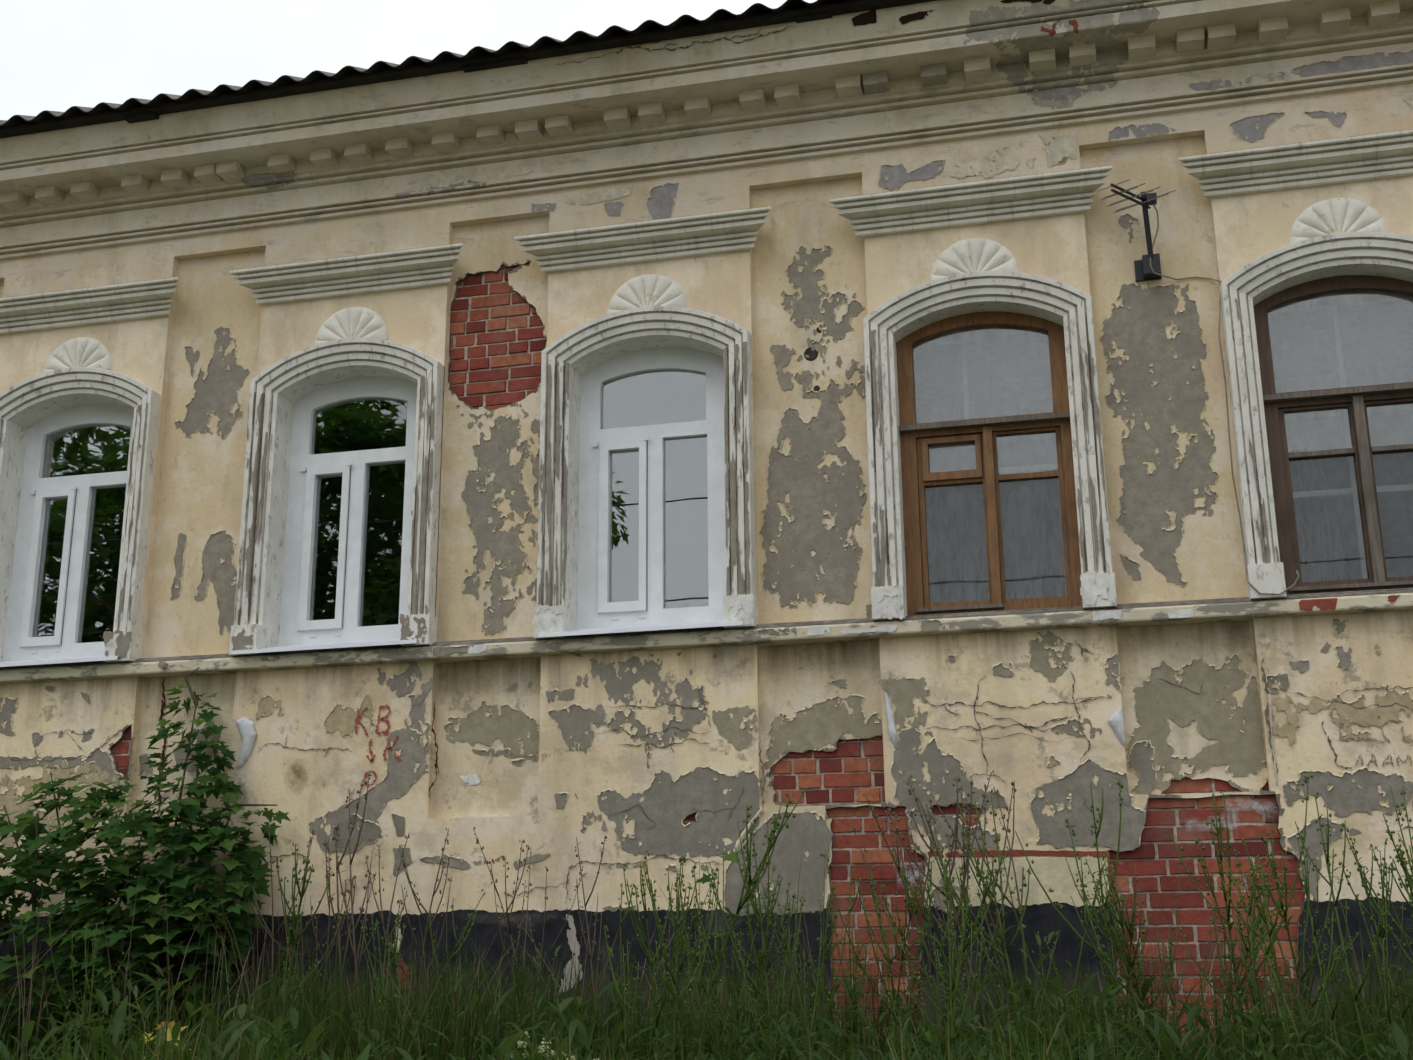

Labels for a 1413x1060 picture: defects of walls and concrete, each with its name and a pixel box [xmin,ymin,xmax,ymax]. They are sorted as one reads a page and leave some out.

peeling [103,402,148,658]
peeling [170,326,273,651]
peeling [0,697,19,737]
peeling [0,725,154,849]
peeling [173,727,222,772]
peeling [309,244,1413,1044]
crack [921,640,1108,783]
crack [1261,657,1413,773]